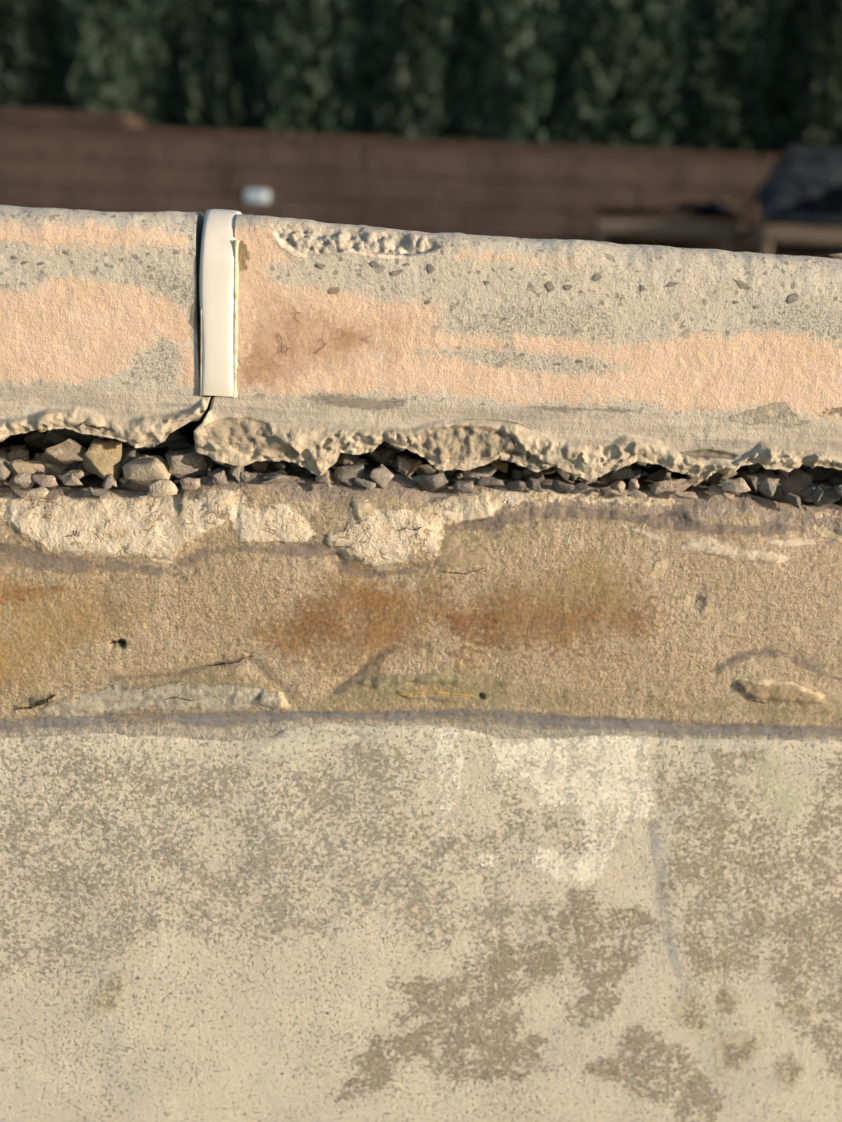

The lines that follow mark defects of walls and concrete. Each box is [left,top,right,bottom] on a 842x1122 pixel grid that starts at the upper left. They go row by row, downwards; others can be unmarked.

spalling [204,417,303,459]
spalling [416,425,554,471]
spalling [681,449,737,460]
peeling [0,486,681,567]
peeling [681,509,842,564]